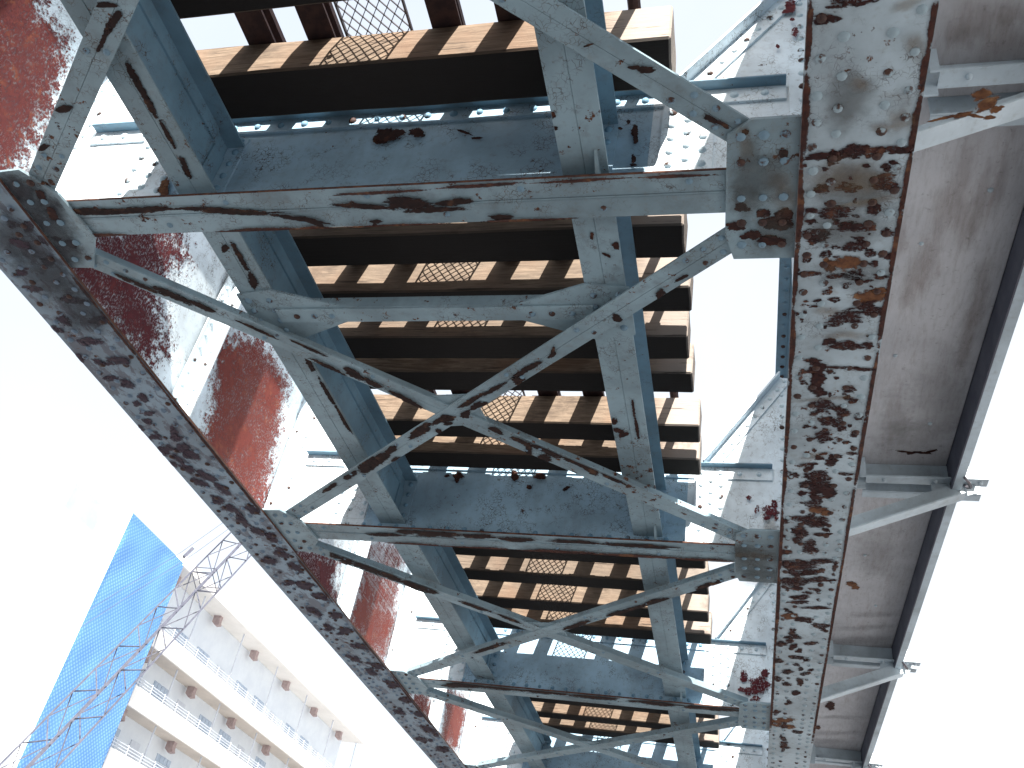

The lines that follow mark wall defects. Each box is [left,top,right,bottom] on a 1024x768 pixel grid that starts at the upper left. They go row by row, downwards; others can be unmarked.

rust [436,174,718,189]
rust [72,275,260,510]
rust [738,0,814,738]
rust [811,1,1005,743]
rust [350,624,433,727]